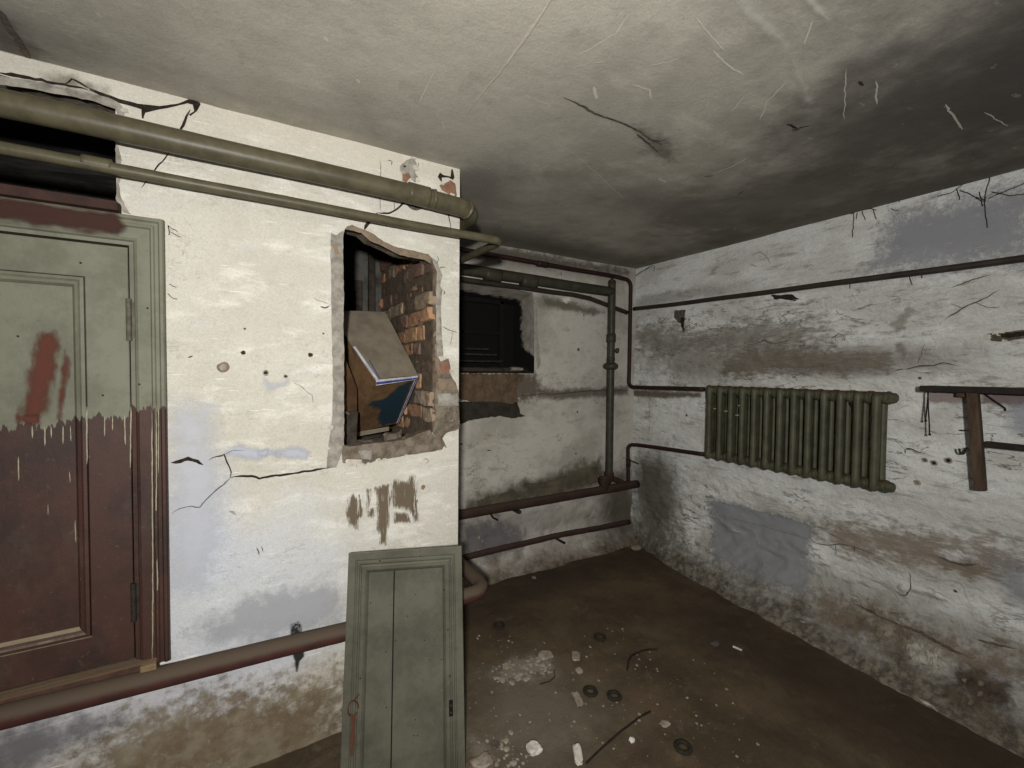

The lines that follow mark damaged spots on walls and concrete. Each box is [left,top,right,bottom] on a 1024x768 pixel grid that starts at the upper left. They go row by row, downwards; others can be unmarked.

crack [565,98,665,153]
spalling [322,225,524,469]
crack [171,450,329,514]
damp [465,522,522,555]
damp [467,459,601,508]
damp [639,460,676,546]
damp [712,502,1024,596]
damp [0,662,344,768]